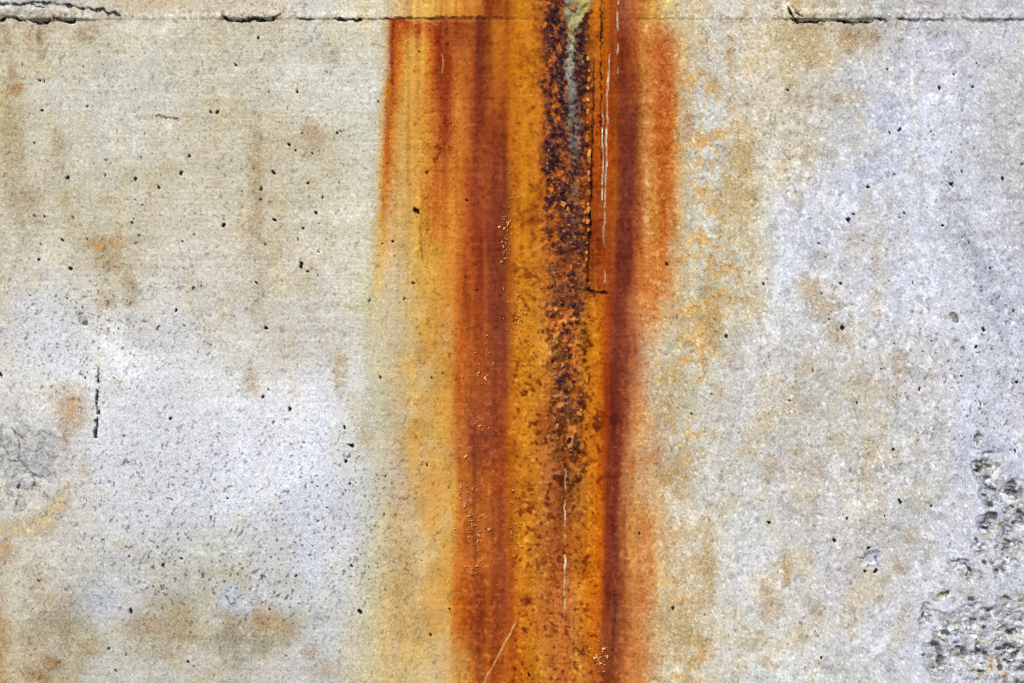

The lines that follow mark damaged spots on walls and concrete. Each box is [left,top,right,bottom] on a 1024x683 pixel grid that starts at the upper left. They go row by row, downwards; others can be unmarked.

crack [0,1,121,25]
crack [787,6,1024,26]
corrosion [301,0,767,683]
spalling [918,430,1024,683]